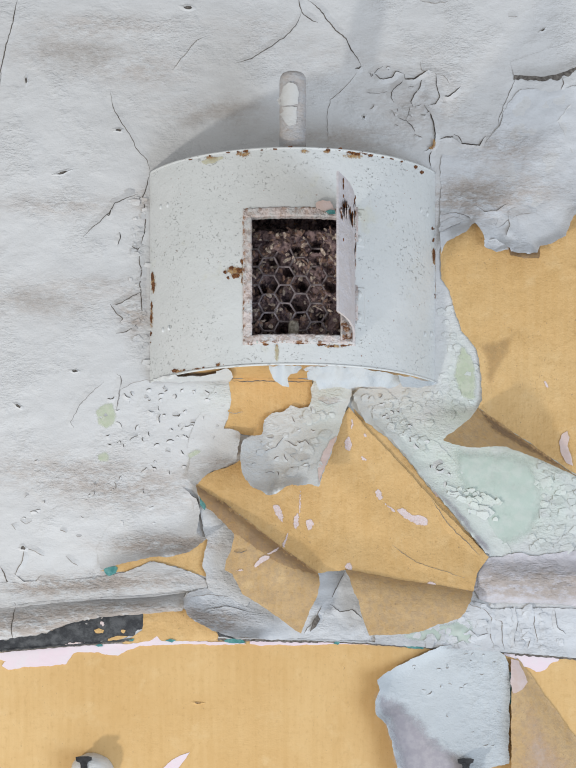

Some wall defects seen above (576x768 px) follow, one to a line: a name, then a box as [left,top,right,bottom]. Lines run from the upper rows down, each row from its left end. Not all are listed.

crack [0,0,20,86]
crack [236,0,517,168]
crack [81,92,152,333]
peeling [437,86,576,554]
peeling [0,378,576,768]